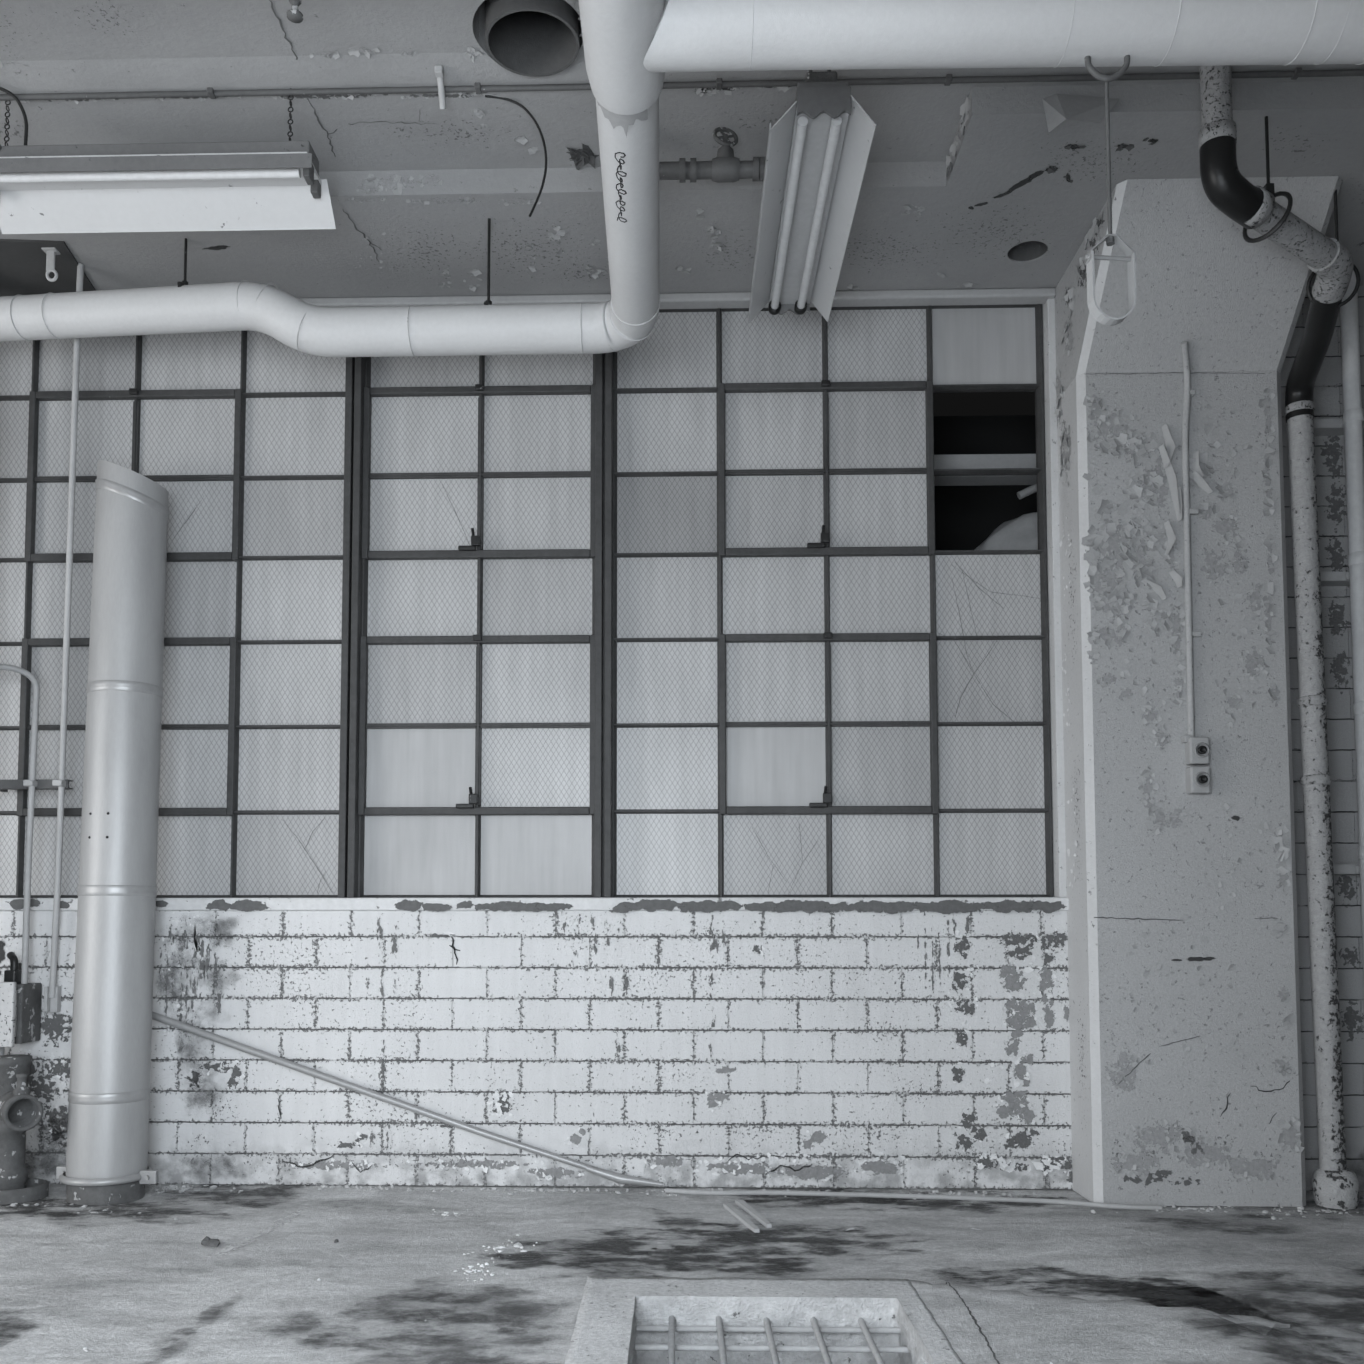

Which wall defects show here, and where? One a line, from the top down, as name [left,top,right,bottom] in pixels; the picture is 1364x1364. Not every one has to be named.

peeling [846,134,1280,753]
peeling [1138,765,1187,835]
peeling [9,898,41,910]
peeling [155,899,269,1034]
peeling [394,899,1086,1183]
peeling [1105,1117,1305,1186]
damp [746,1189,1054,1213]
damp [493,1208,891,1277]
damp [0,1318,36,1345]
damp [271,1315,320,1343]
damp [421,1336,496,1364]
damp [382,1291,551,1323]